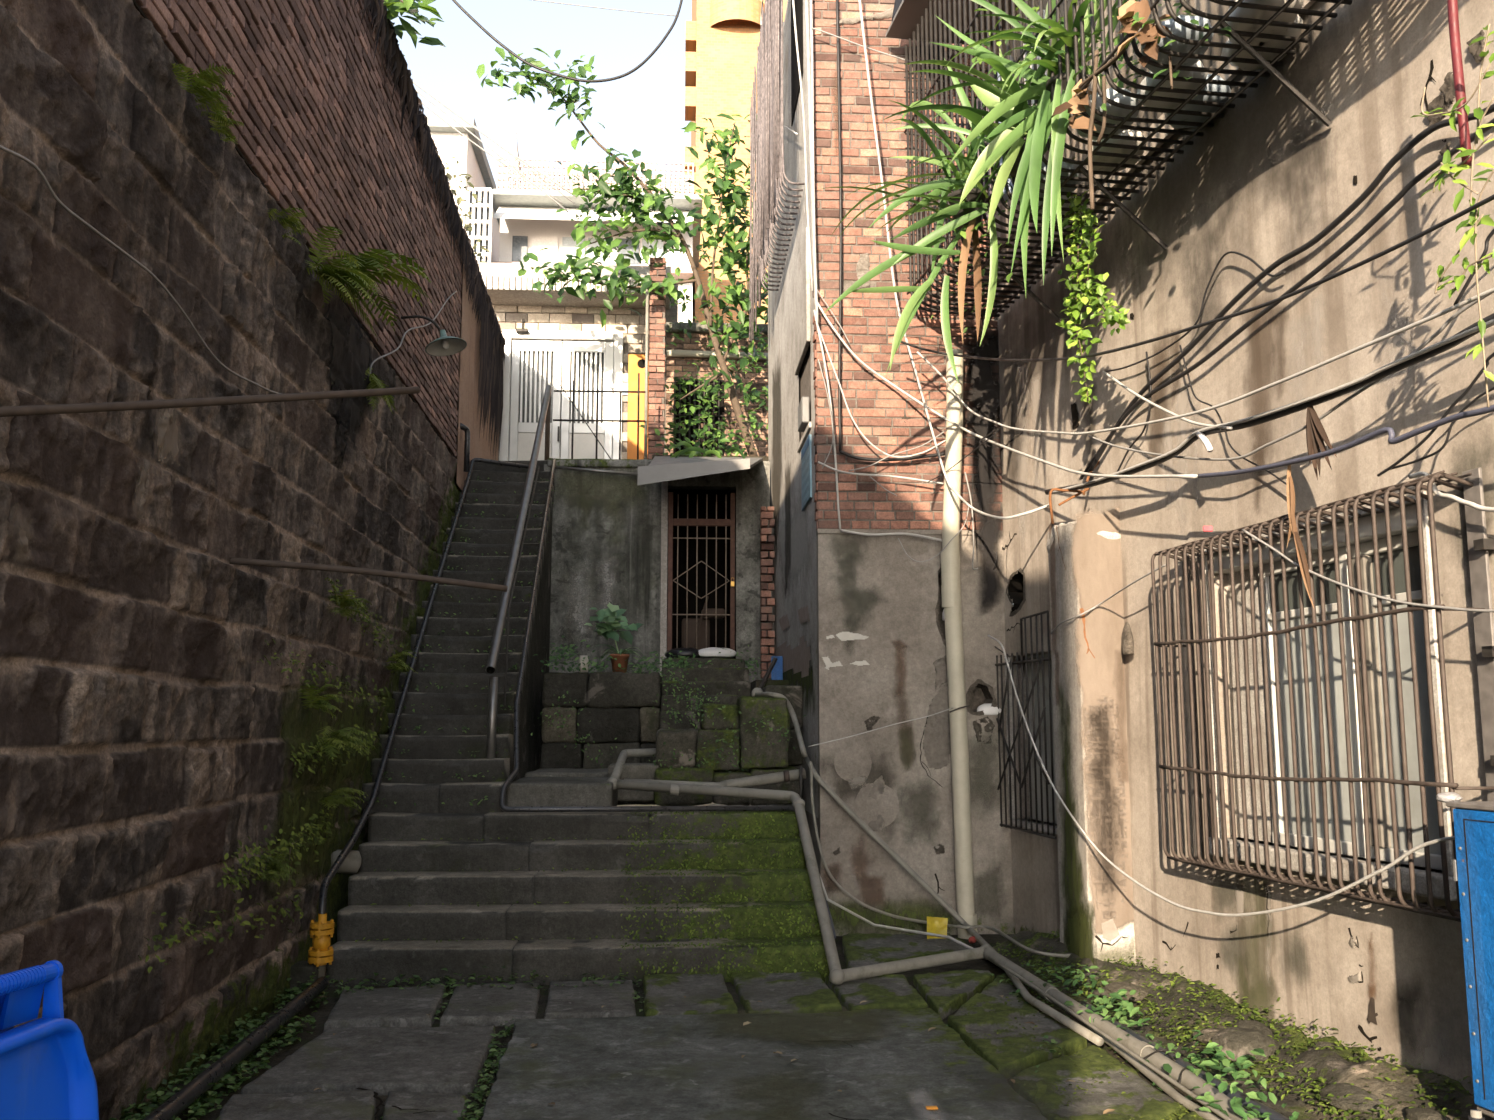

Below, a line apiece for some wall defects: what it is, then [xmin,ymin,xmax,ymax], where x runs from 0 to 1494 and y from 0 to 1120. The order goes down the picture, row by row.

leakage [1003,278,1097,530]
leakage [837,541,879,647]
leakage [975,510,1003,609]
spalling [1006,568,1026,617]
leakage [832,763,892,799]
leakage [898,692,912,766]
leakage [1064,507,1134,965]